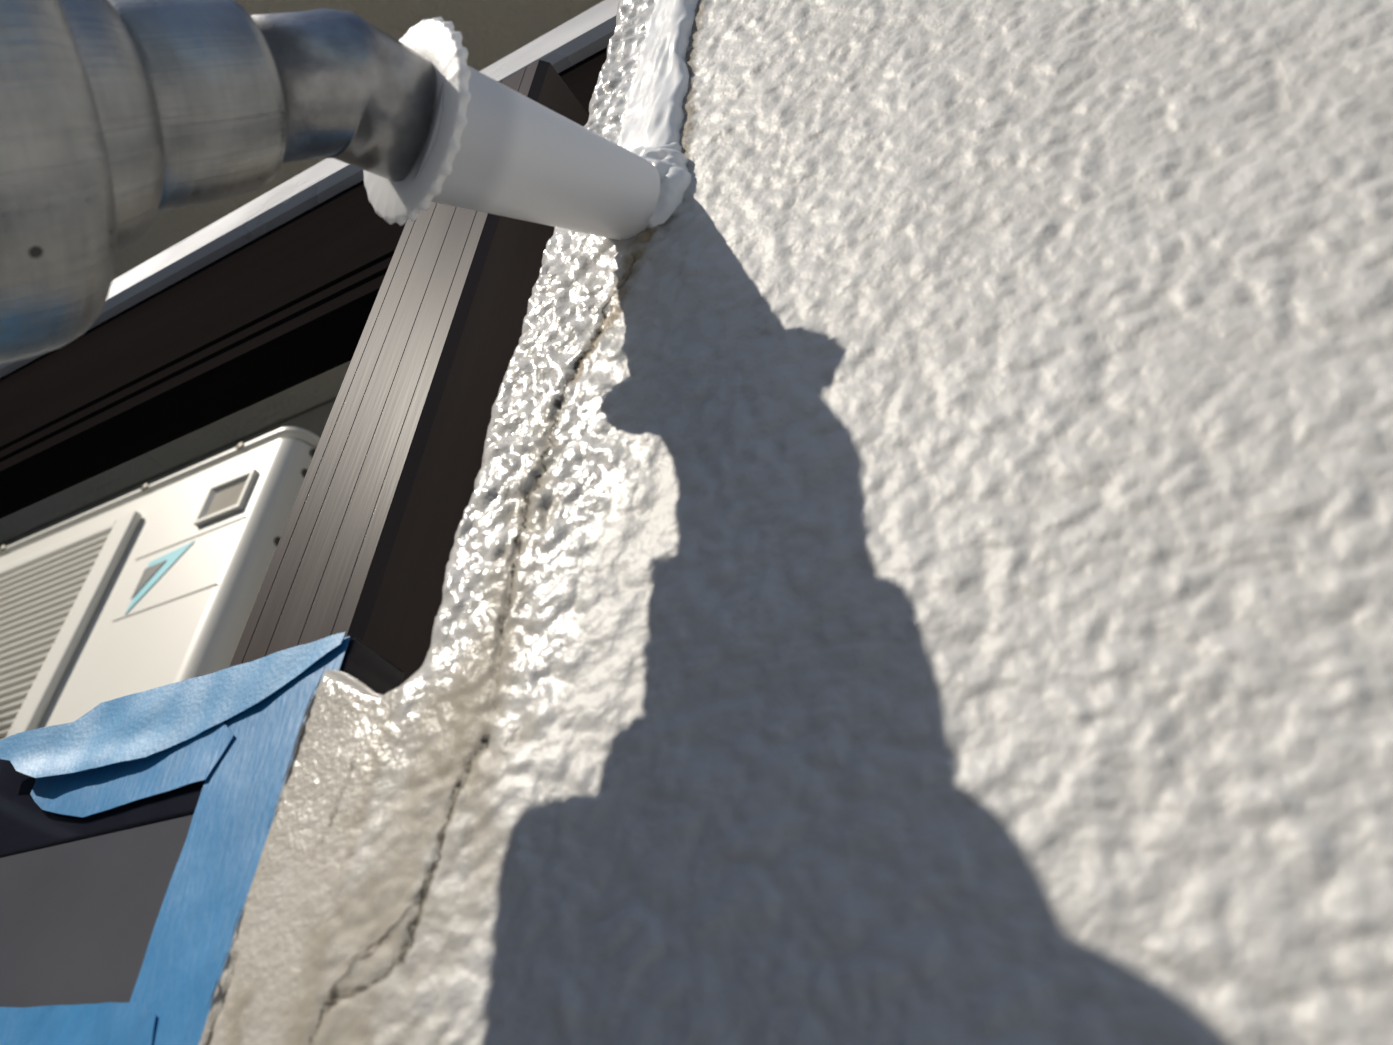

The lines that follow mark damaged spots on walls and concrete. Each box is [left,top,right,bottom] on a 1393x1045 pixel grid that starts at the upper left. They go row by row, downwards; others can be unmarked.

crack [309,247,635,1044]